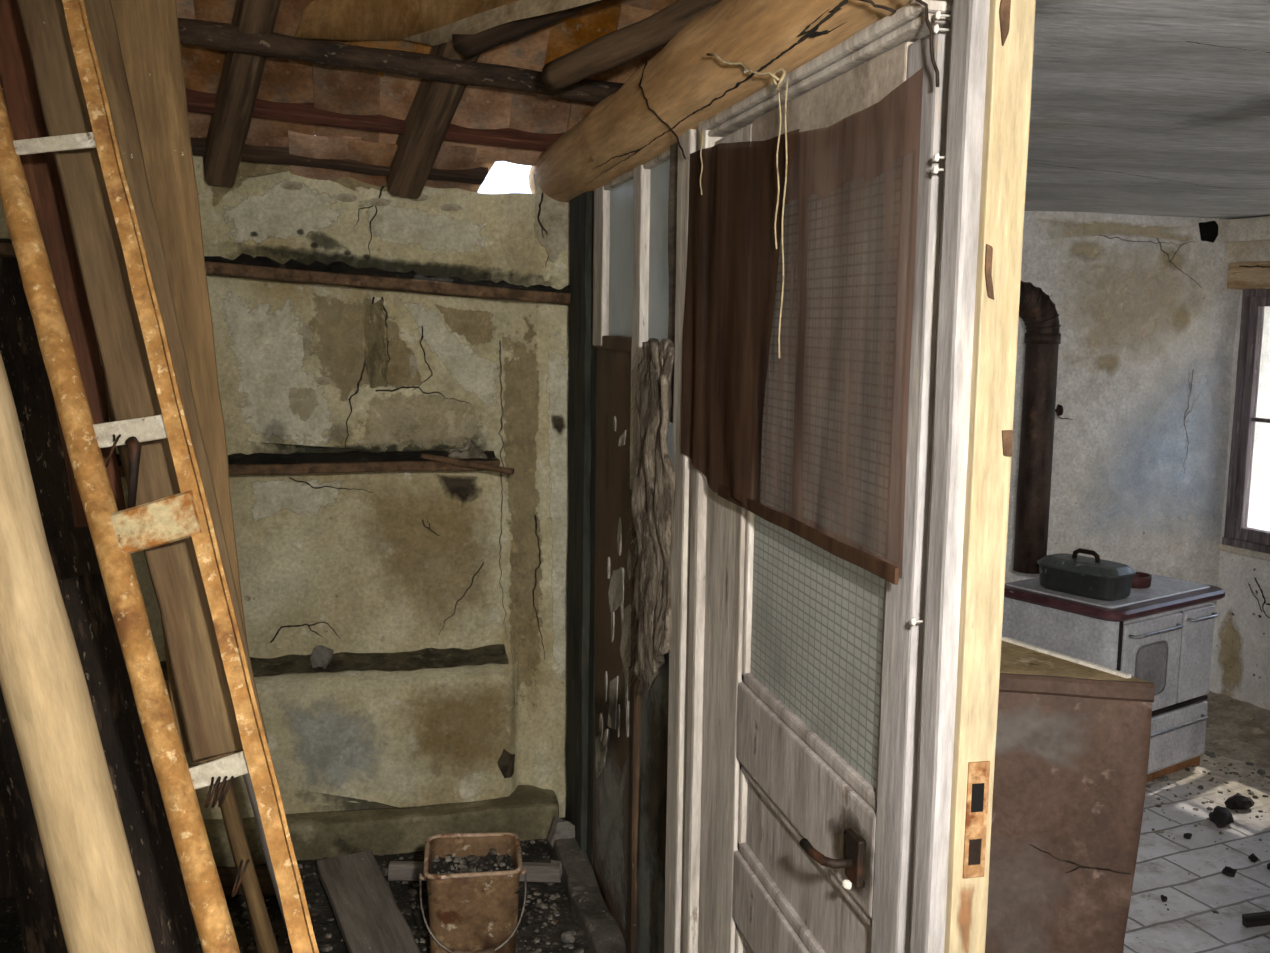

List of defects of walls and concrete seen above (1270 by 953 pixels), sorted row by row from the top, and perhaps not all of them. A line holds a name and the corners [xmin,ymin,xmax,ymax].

crack [1186,41,1270,53]
flaking render [212,161,303,206]
flaking render [328,177,391,206]
flaking render [533,174,570,263]
crack [344,297,545,659]
crack [1248,578,1270,618]
crack [270,622,340,643]
peeling [595,517,631,778]
flaking render [1219,613,1261,696]